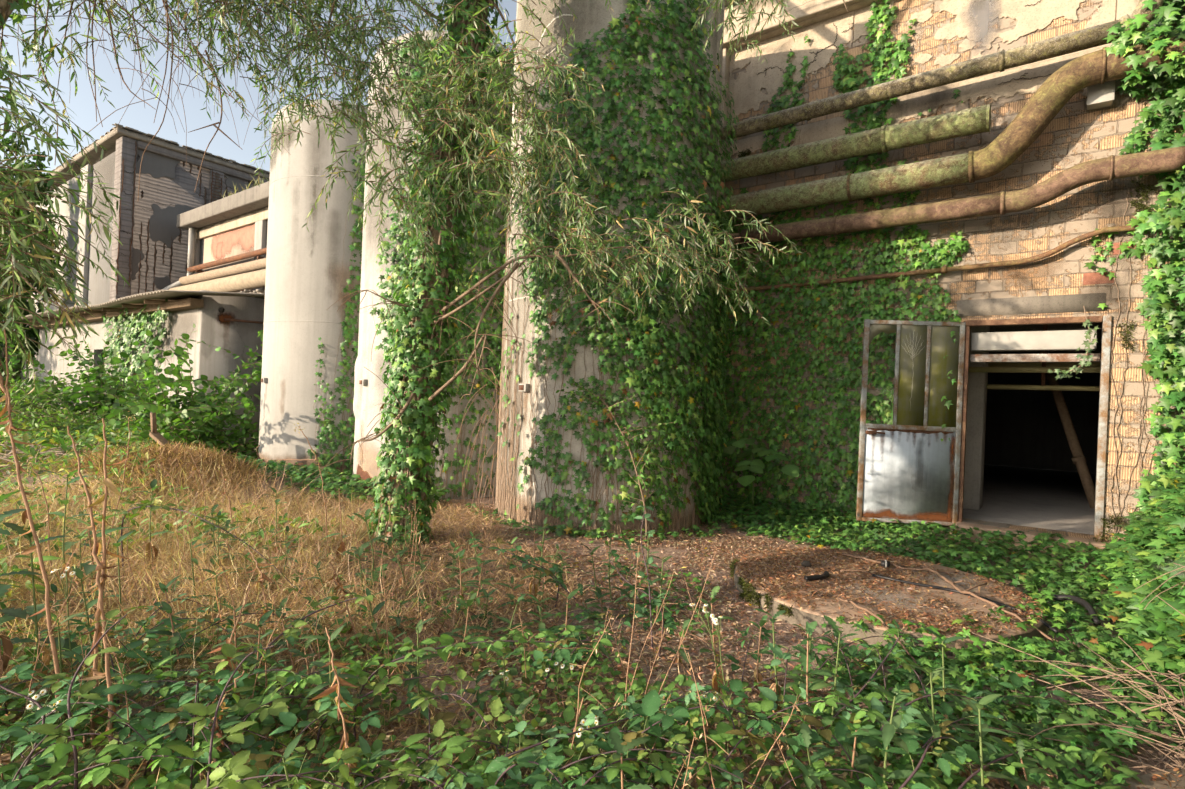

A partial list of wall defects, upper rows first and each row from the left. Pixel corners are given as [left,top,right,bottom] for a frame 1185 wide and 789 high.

damp [967,0,998,44]
crack [757,23,852,77]
peeling [726,0,1116,160]
spalling [183,162,228,205]
spalling [116,140,187,296]
peeling [212,224,255,260]
rust [862,428,955,522]